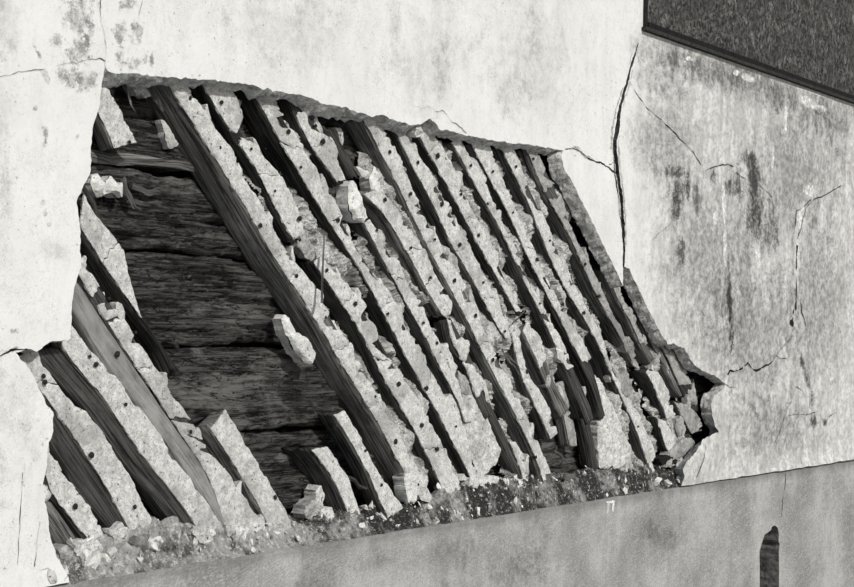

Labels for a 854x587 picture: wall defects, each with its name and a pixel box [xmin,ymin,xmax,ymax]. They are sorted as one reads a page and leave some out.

crack [0,0,106,77]
water stain [55,0,94,59]
crack [565,43,772,266]
water stain [666,167,699,219]
water stain [711,150,779,268]
spalling [102,62,725,487]
crack [726,185,842,388]
crack [0,347,27,356]
crack [775,386,835,442]
spalling [37,568,57,583]